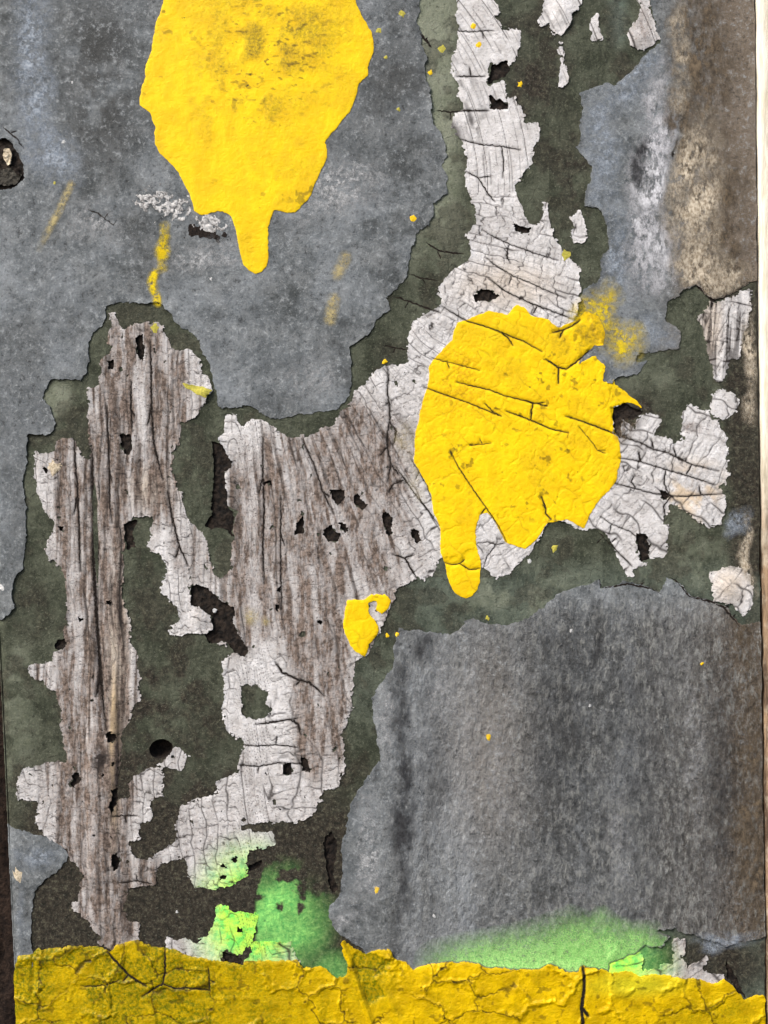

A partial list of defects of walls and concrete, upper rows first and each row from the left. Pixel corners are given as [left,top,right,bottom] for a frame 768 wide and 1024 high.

peeling [349,0,661,381]
peeling [0,281,761,978]
crack [446,454,505,570]
crack [396,231,724,514]
crack [85,951,214,995]
crack [580,967,588,1024]